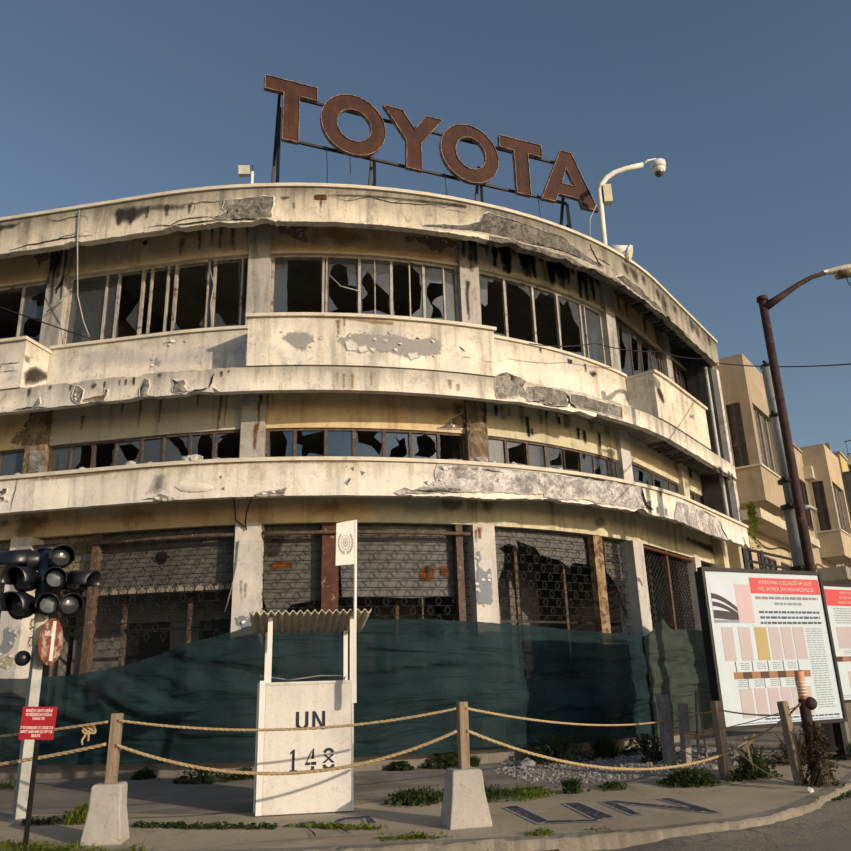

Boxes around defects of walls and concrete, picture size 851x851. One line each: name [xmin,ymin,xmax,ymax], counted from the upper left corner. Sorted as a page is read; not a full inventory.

damp [115,204,192,225]
crack [146,200,225,228]
spalling [213,195,275,221]
peeling [279,226,311,245]
damp [462,240,599,301]
spalling [405,211,692,351]
peeling [281,330,323,350]
peeling [337,330,442,361]
spalling [493,372,623,419]
rust [254,395,268,448]
spalling [393,463,646,510]
peeling [674,501,728,540]